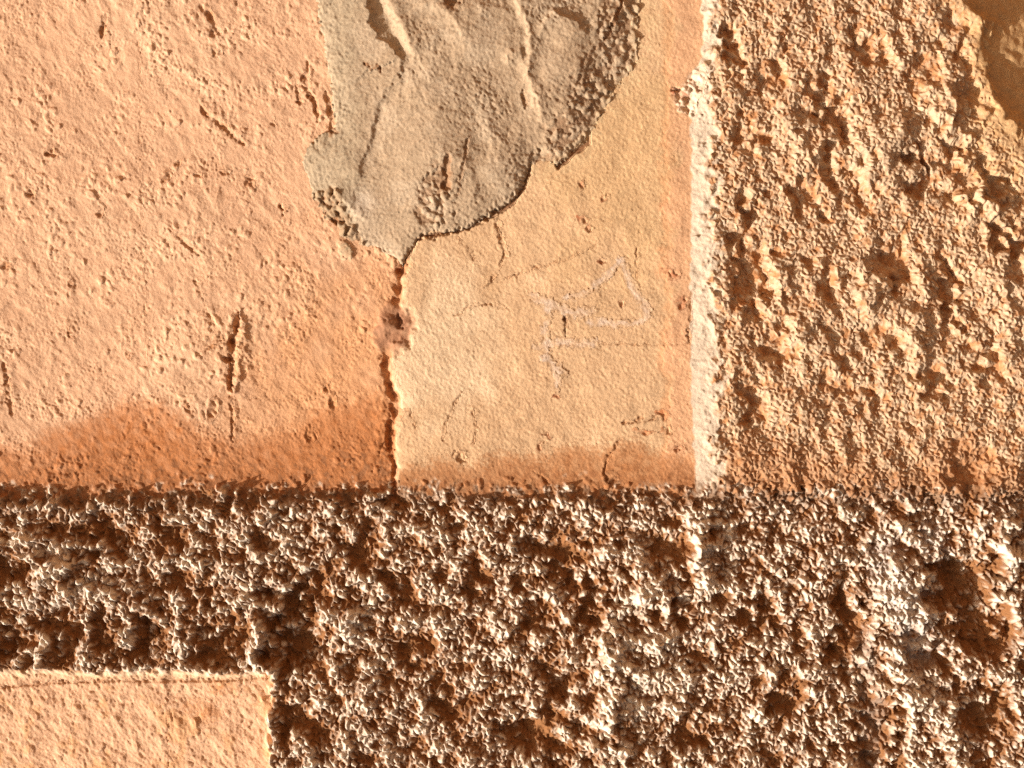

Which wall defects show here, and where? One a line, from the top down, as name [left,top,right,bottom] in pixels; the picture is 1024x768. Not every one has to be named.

spalling [312,186,366,246]
crack [388,170,596,316]
peeling [576,215,594,233]
crack [377,353,416,503]